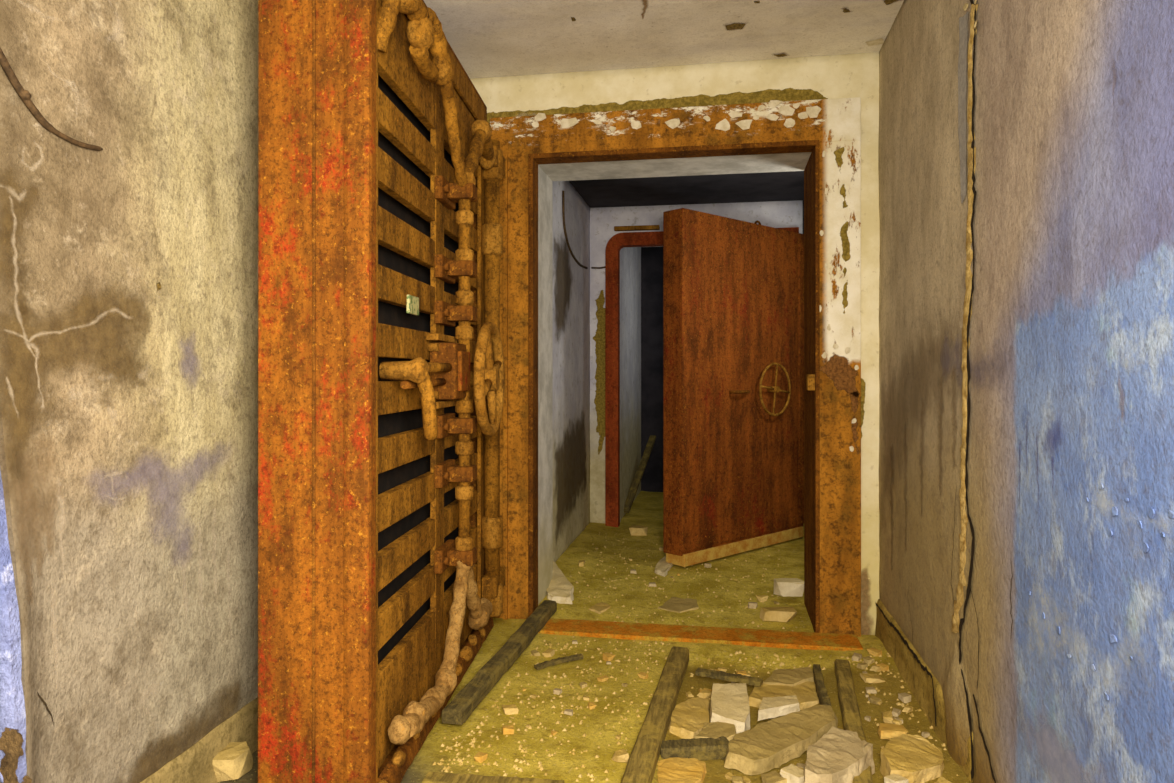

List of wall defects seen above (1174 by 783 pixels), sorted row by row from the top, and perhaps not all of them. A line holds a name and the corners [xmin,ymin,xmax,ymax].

peeling [487,88,828,132]
peeling [822,147,844,167]
peeling [840,222,851,313]
peeling [820,324,866,454]
crack [951,0,996,783]
rust [861,570,872,635]
crack [876,573,937,726]
peeling [0,727,32,783]